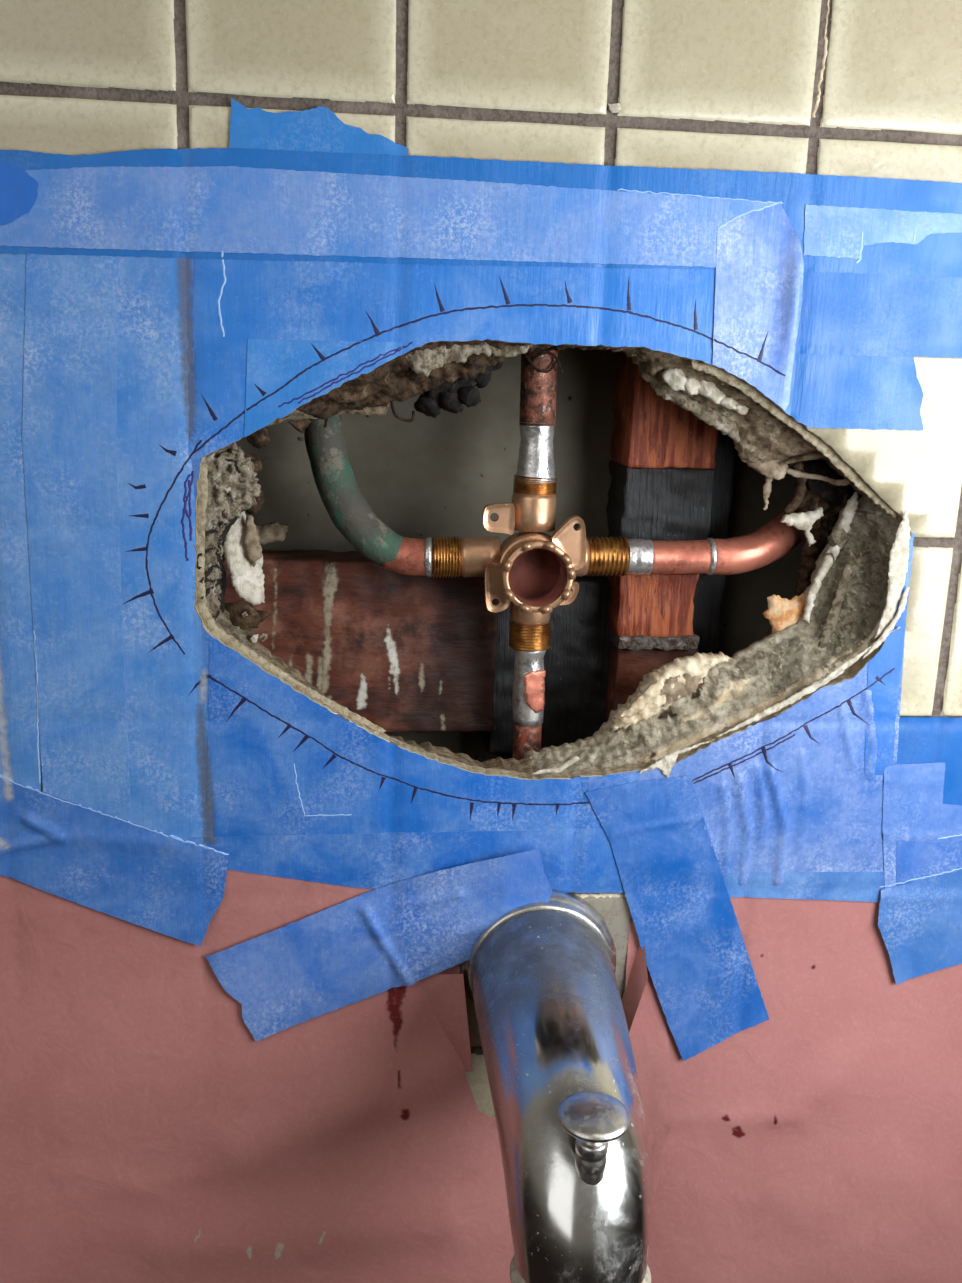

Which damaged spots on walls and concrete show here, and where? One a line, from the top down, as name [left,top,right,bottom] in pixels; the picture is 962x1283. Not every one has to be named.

spalling [195,340,911,778]